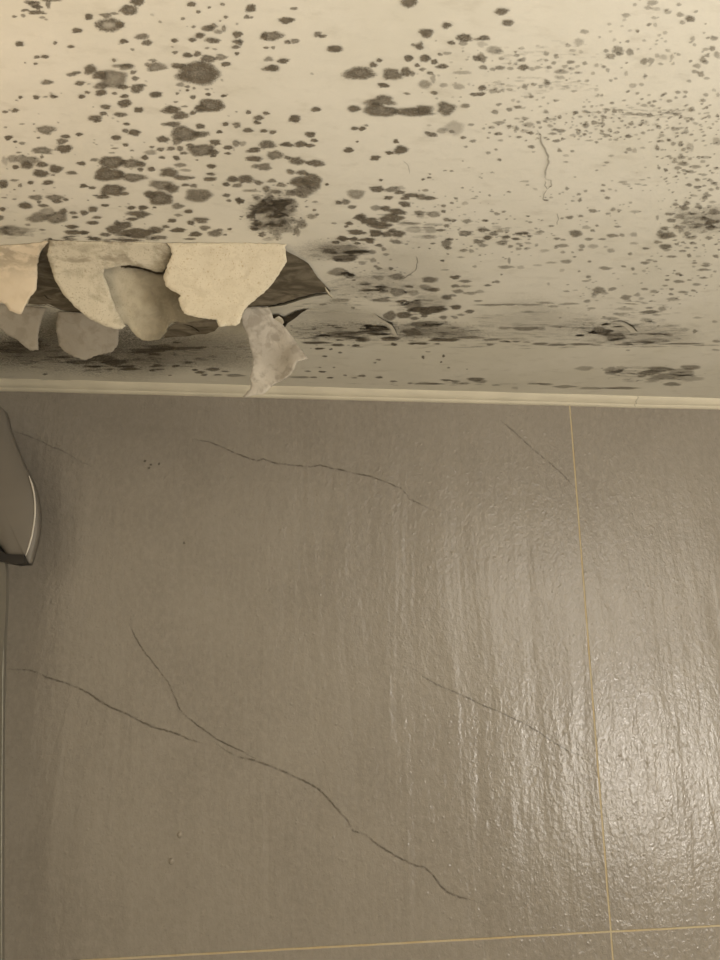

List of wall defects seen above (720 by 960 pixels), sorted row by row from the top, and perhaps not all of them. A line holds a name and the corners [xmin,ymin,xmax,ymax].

water stain [0,0,329,242]
water stain [315,32,343,53]
water stain [370,139,408,161]
water stain [344,23,489,153]
water stain [322,179,522,281]
water stain [496,9,513,26]
water stain [643,136,718,249]
water stain [0,321,242,376]
peeling [0,240,334,398]
water stain [303,332,369,379]
water stain [377,267,477,359]